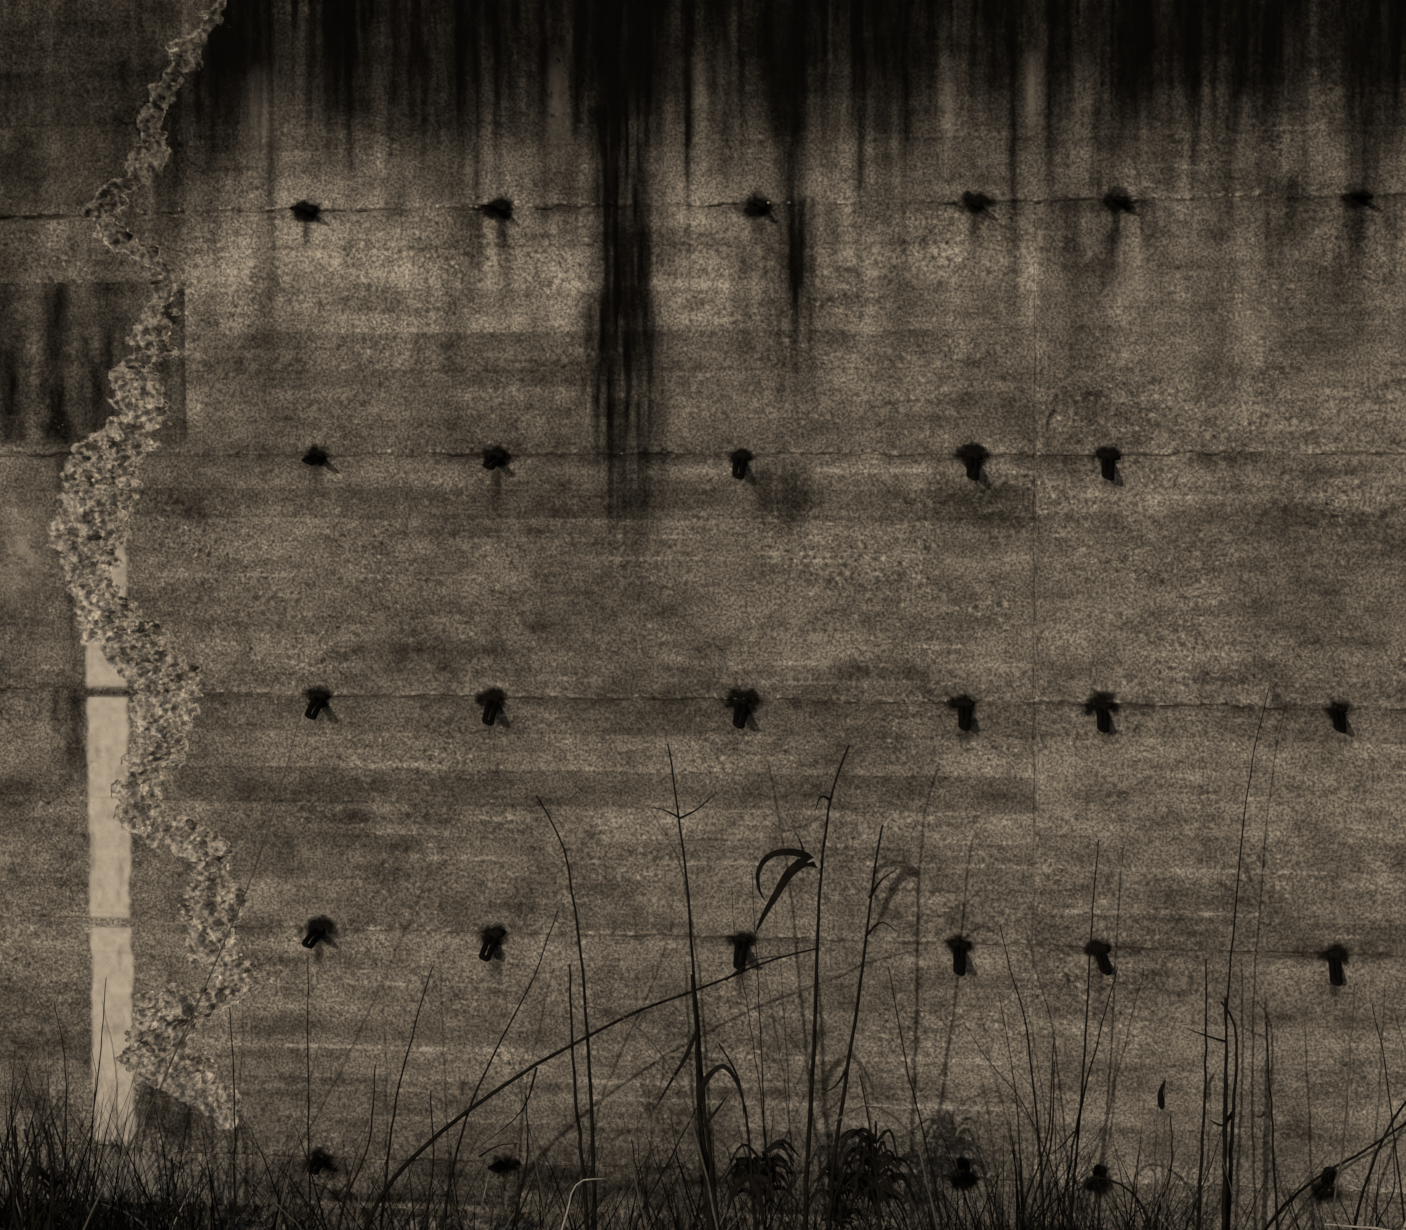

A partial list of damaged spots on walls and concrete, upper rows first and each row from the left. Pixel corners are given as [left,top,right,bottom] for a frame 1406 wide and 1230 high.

water stain [134,0,1406,496]
water stain [0,282,123,459]
spalling [116,970,242,1130]